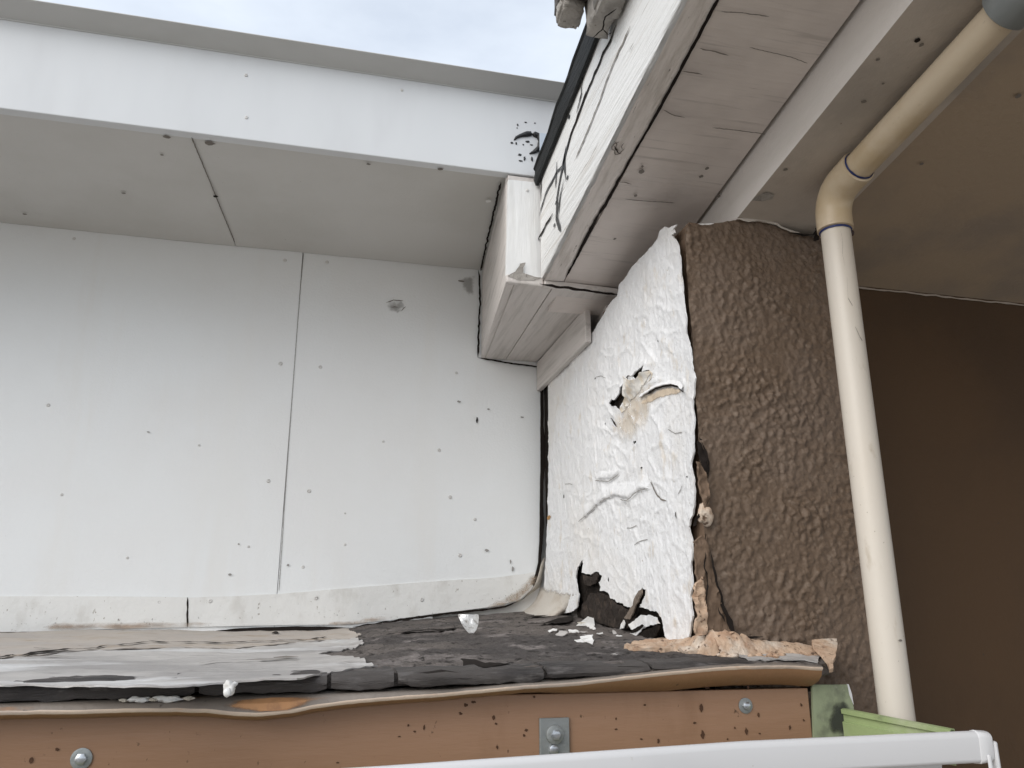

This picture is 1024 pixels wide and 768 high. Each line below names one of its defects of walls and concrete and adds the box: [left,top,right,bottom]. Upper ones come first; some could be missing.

crack [541,0,806,295]
peeling [639,380,683,404]
spalling [548,461,821,663]
peeling [0,628,378,703]